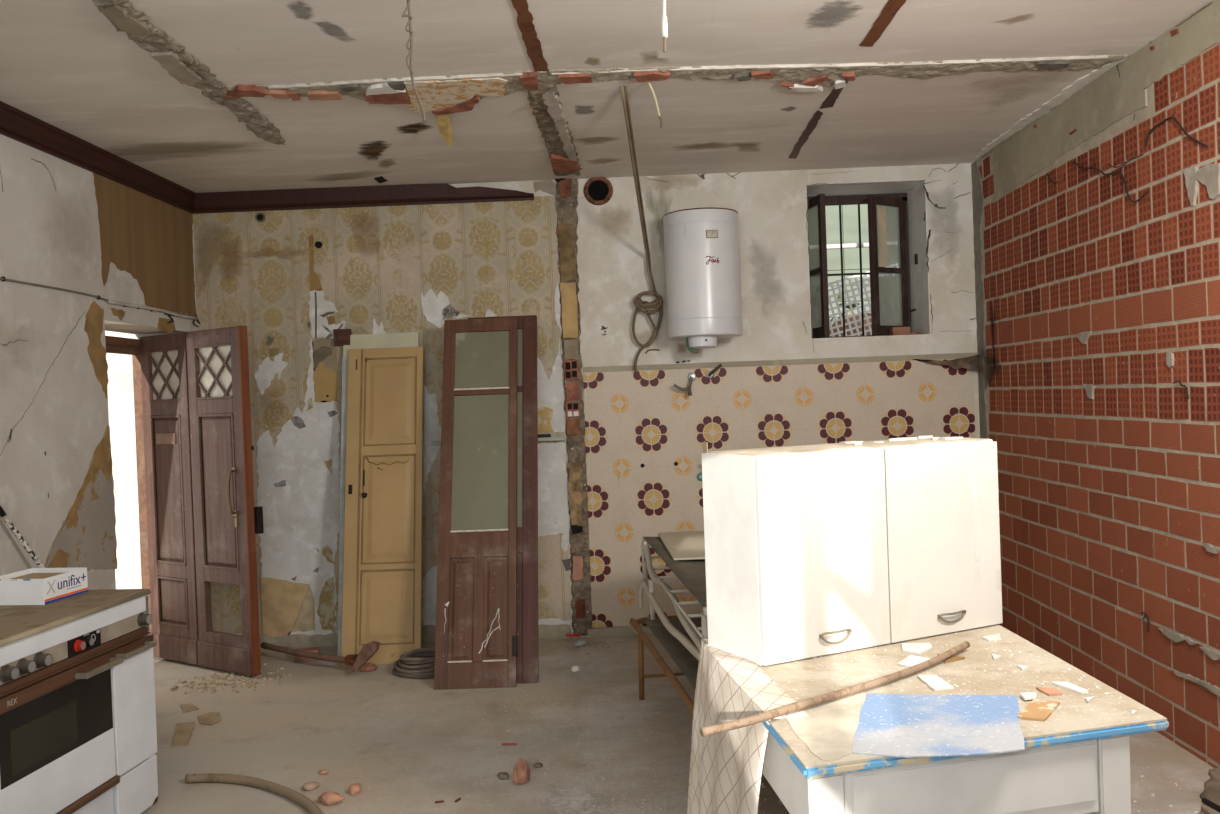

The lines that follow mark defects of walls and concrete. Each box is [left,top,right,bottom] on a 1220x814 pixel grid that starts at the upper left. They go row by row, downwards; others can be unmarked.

flaking render [366,83,406,95]
flaking render [789,80,846,92]
crack [0,311,85,456]
spalling [290,416,306,429]